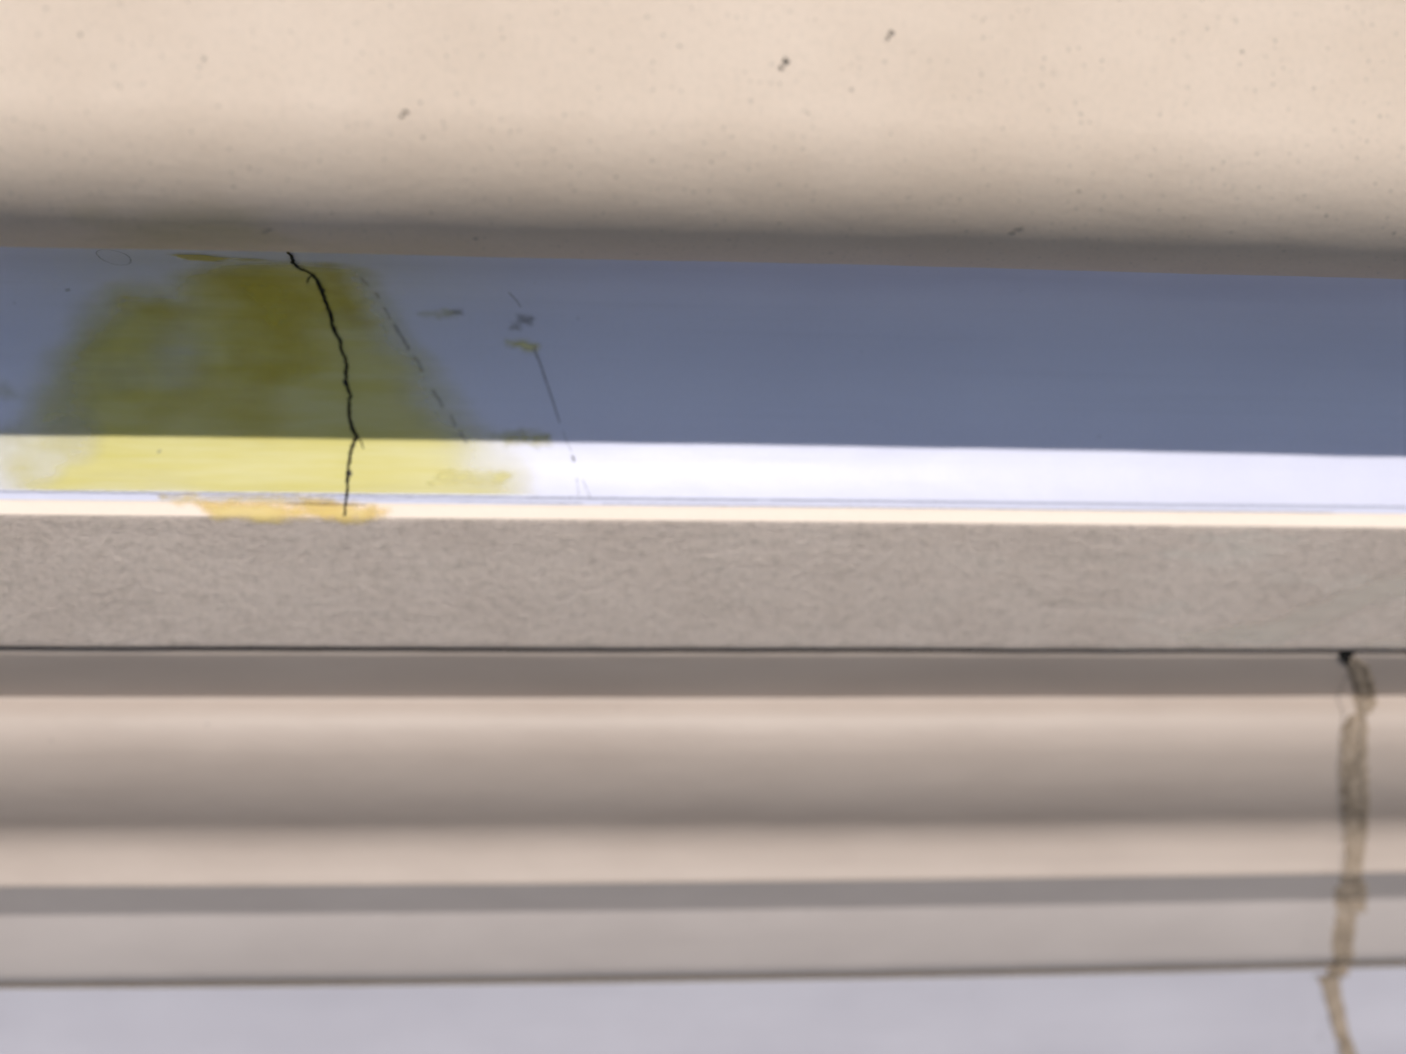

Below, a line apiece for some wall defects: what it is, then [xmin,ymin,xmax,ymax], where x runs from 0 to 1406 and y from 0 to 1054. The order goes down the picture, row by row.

leakage [39,255,508,523]
crack [286,252,366,516]